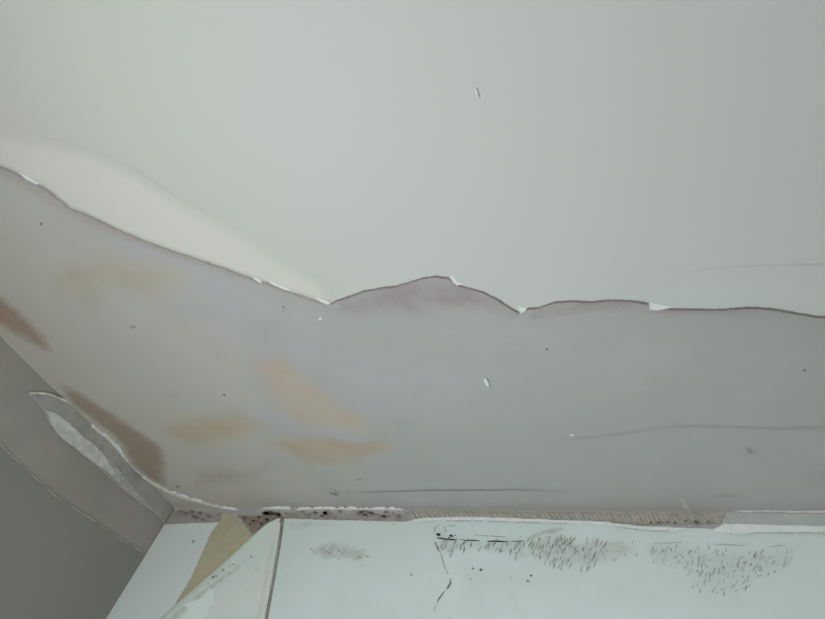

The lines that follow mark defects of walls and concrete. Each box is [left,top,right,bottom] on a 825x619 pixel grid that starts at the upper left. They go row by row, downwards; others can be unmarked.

water stain [0,129,825,324]
peeling [0,165,825,619]
water stain [433,525,810,619]